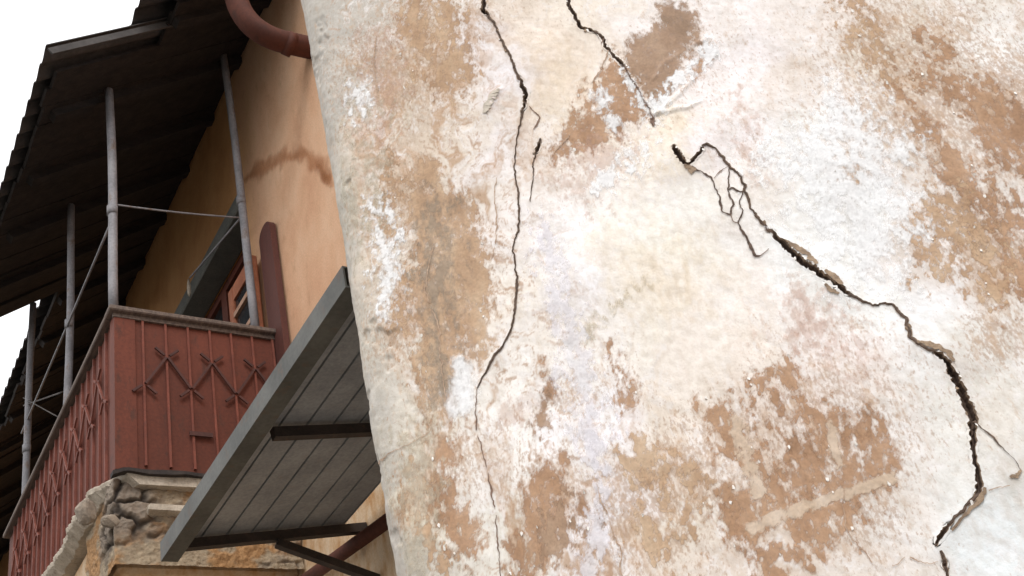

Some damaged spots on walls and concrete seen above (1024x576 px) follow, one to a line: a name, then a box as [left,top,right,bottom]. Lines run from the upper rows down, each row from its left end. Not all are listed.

peeling [379,148,497,576]
crack [474,0,570,576]
crack [565,0,655,126]
peeling [551,2,718,166]
peeling [613,354,903,576]
crack [670,142,1022,576]
peeling [827,0,1024,313]